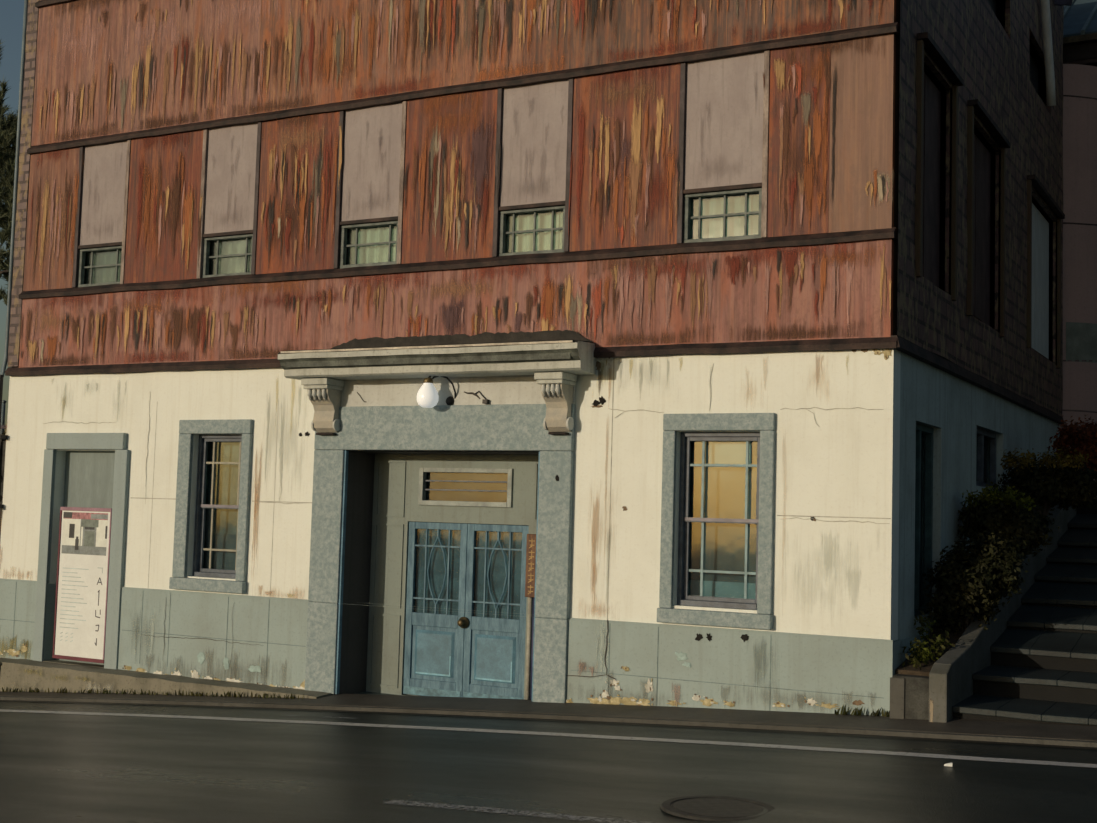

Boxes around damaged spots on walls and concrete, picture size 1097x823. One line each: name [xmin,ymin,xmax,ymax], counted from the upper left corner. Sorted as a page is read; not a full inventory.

rust [20,0,891,366]
crack [780,407,884,425]
crack [788,516,890,524]
crack [566,620,615,679]
spalling [587,666,654,706]
spalling [666,694,735,707]